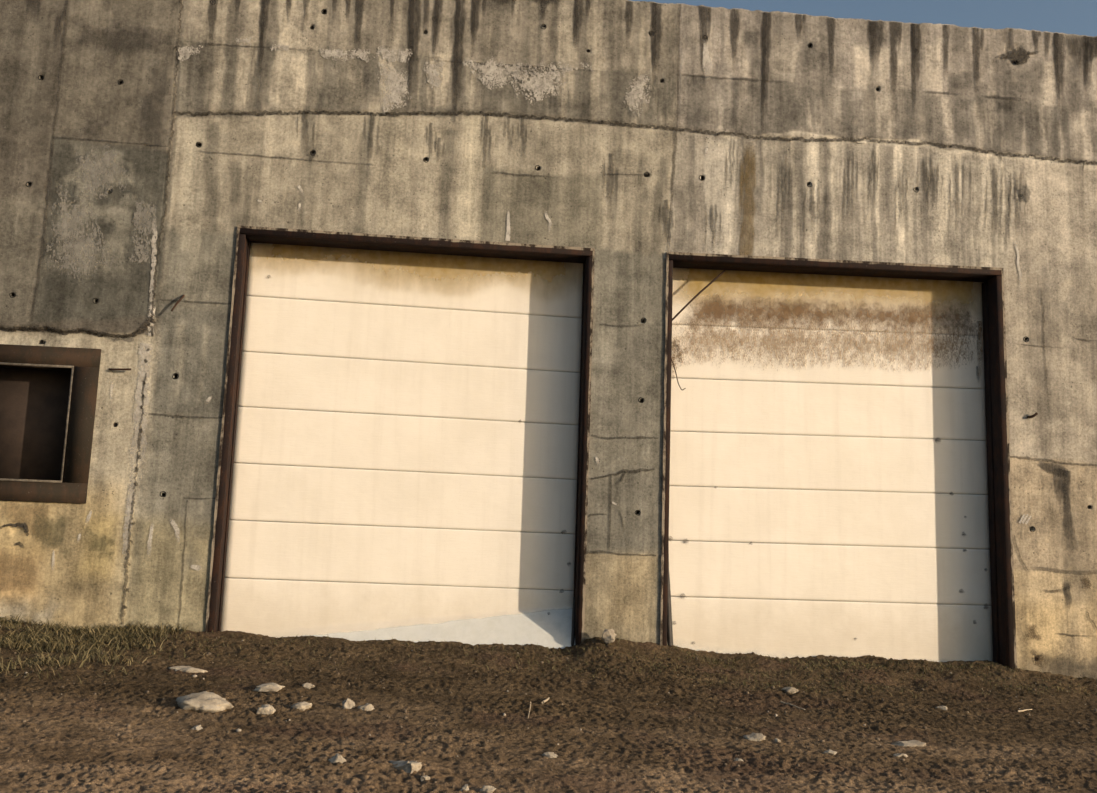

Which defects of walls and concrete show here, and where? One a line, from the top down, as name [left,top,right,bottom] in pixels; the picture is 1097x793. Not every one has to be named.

leakage [209,0,218,25]
leakage [236,0,290,52]
leakage [320,0,592,139]
leakage [651,2,662,60]
leakage [699,6,712,71]
leakage [731,9,739,46]
leakage [762,12,771,101]
leakage [868,21,921,85]
leakage [973,28,984,72]
leakage [1033,31,1097,87]
crack [120,0,1097,625]
leakage [1040,463,1073,533]